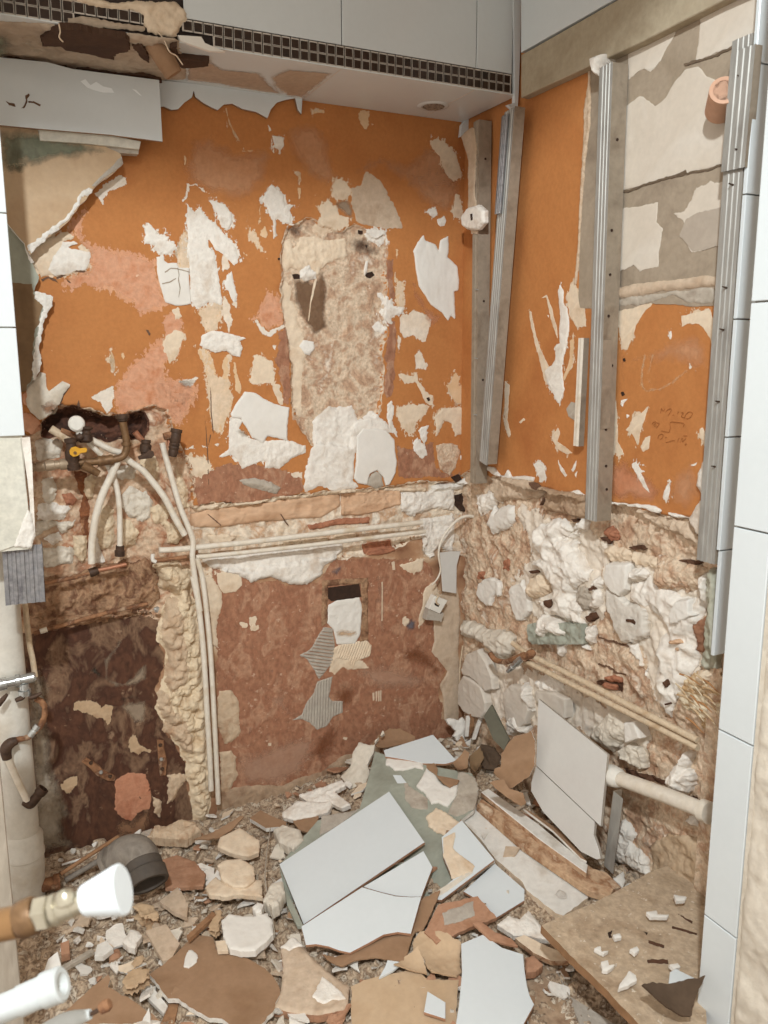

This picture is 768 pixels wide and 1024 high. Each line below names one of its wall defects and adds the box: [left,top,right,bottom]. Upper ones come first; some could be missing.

spalling [0,0,327,154]
flaking render [615,20,732,106]
flaking render [536,71,599,371]
spalling [22,164,723,799]
spalling [596,786,698,880]